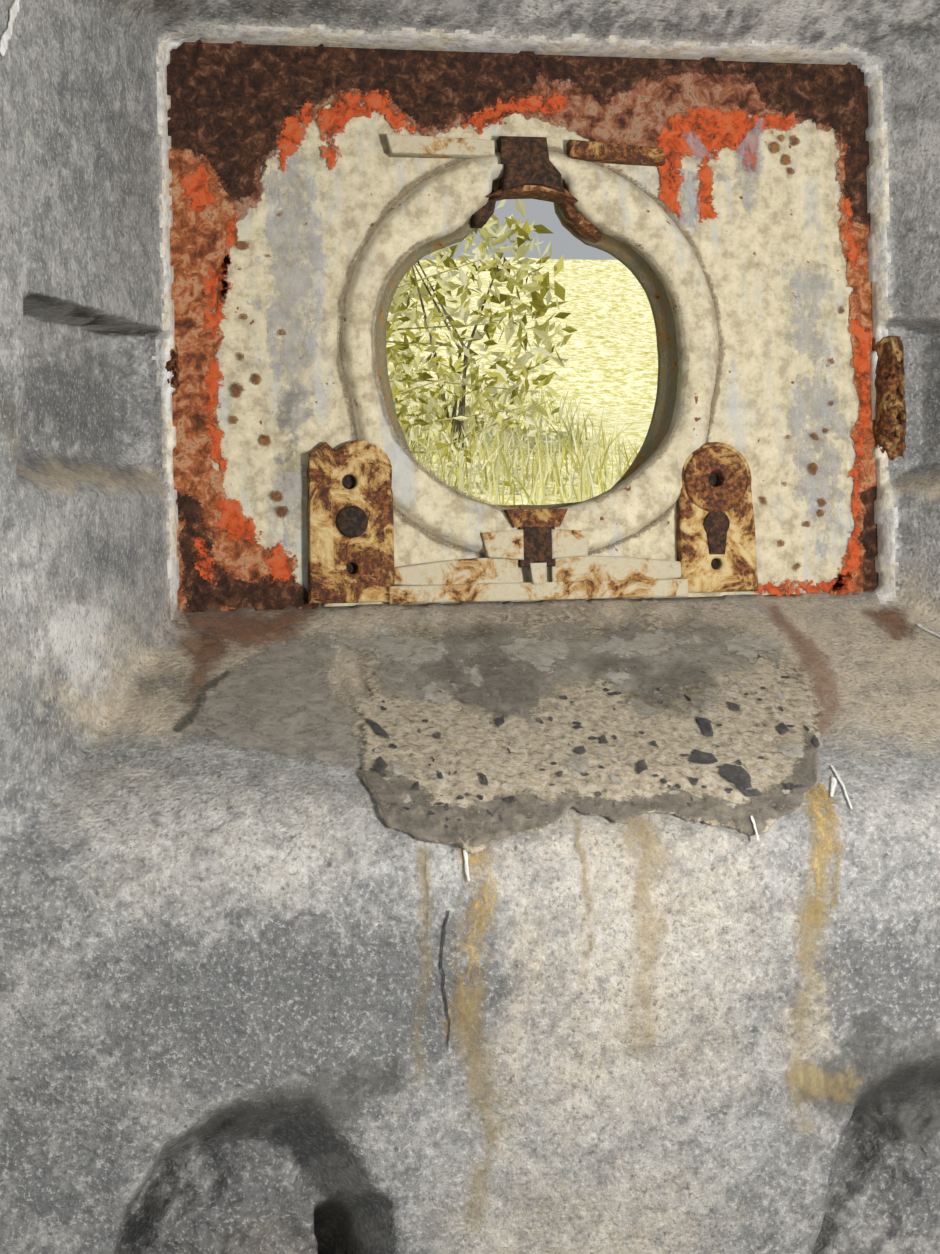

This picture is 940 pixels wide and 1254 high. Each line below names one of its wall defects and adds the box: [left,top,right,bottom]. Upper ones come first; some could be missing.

corrosion [770,134,800,175]
peeling [167,40,879,612]
corrosion [230,373,262,398]
corrosion [270,491,289,518]
corrosion [803,498,826,527]
spalling [174,599,826,854]
leakage [798,1016,940,1142]